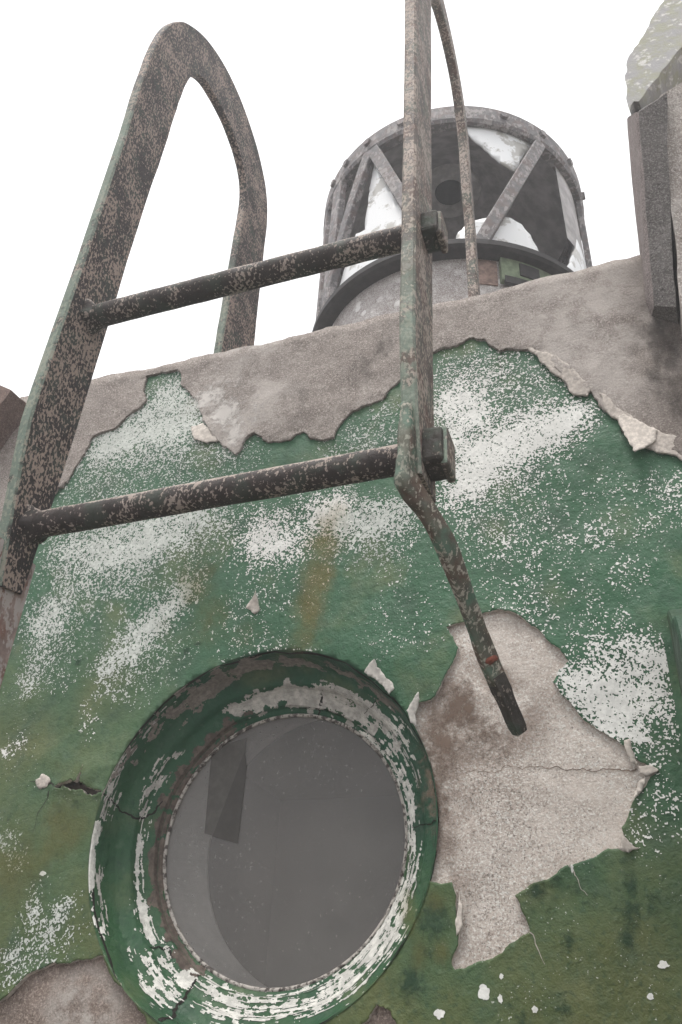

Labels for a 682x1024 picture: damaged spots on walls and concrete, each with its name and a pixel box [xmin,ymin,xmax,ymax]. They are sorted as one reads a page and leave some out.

water stain [195,379,262,446]
peeling [0,252,682,1024]
crack [124,651,637,792]
crack [30,774,163,985]
crack [376,820,436,979]